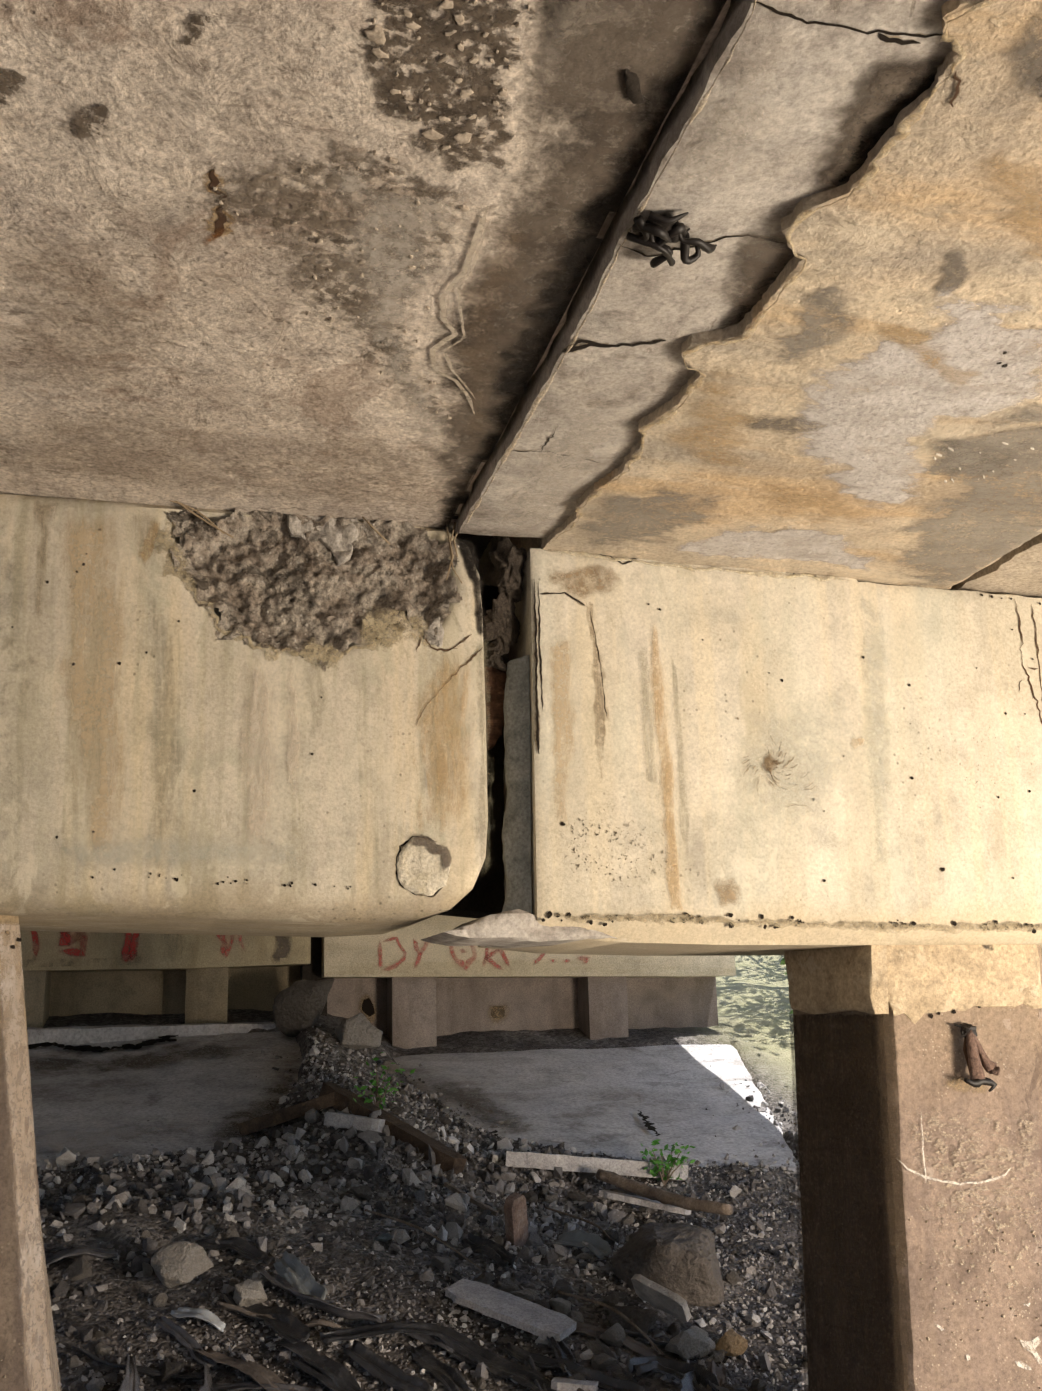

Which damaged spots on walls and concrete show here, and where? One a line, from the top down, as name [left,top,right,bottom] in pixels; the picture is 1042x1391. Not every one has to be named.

crack [752,2,943,45]
peeling [0,68,27,105]
peeling [67,104,109,140]
leakage [820,61,944,188]
leakage [430,0,727,533]
leakage [721,236,794,327]
spalling [152,0,757,672]
crack [562,339,666,353]
crack [1015,601,1042,724]
spalling [421,909,630,949]